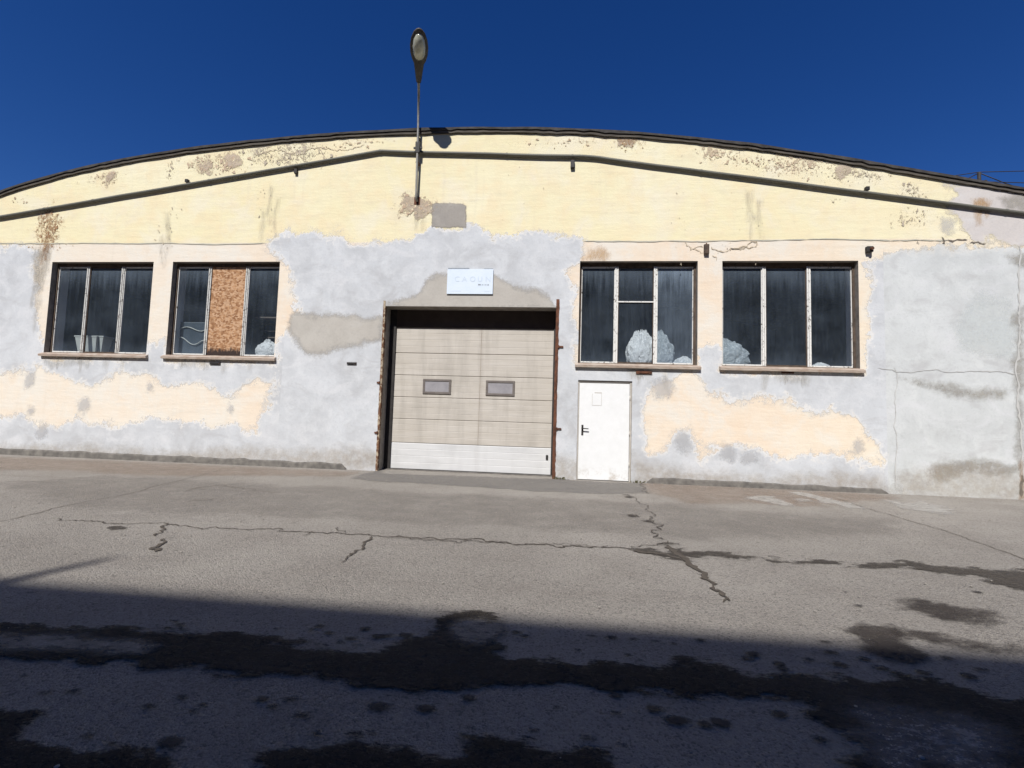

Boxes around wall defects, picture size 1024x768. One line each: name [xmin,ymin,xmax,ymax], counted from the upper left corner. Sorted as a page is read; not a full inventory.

spalling [89,171,126,187]
peeling [166,137,383,179]
peeling [679,145,891,184]
crack [686,241,758,260]
flaking render [0,182,1024,500]
crack [880,368,1019,488]